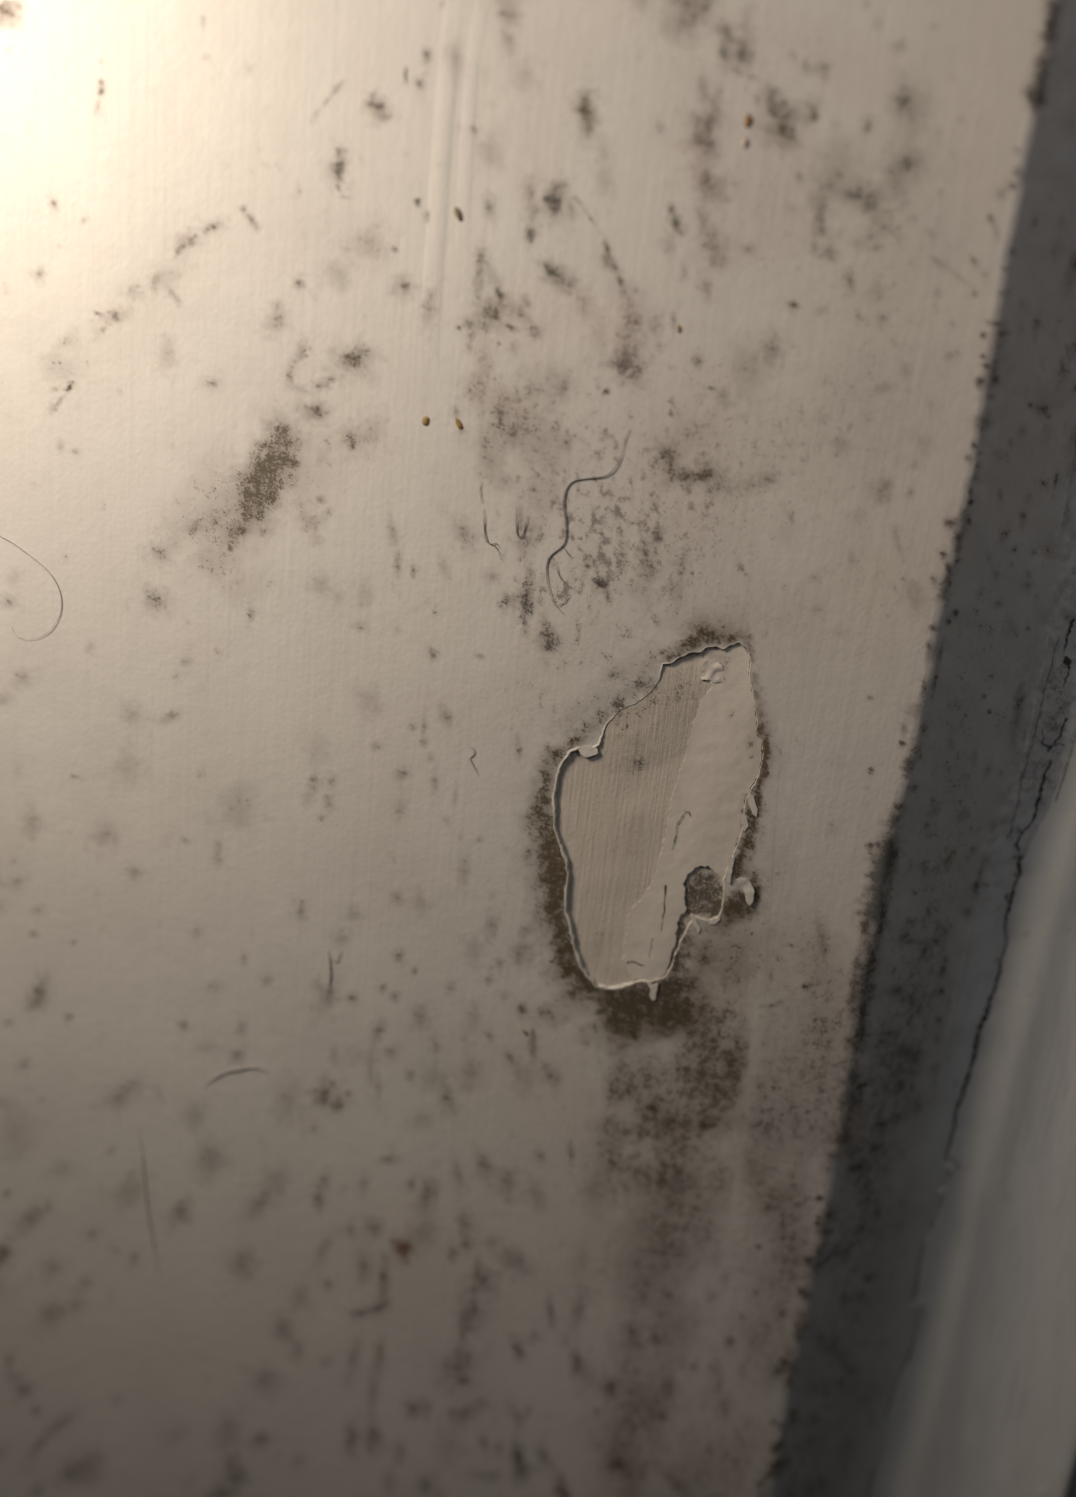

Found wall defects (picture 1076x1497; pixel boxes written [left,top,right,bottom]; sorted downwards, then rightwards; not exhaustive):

damp [1025,0,1061,111]
damp [332,148,343,190]
damp [527,181,576,242]
damp [457,253,570,482]
damp [602,243,675,394]
damp [183,419,300,571]
damp [498,580,557,651]
damp [658,438,718,490]
damp [922,420,990,698]
peeling [525,622,770,1047]
crack [945,619,1076,1160]
damp [593,802,921,1497]